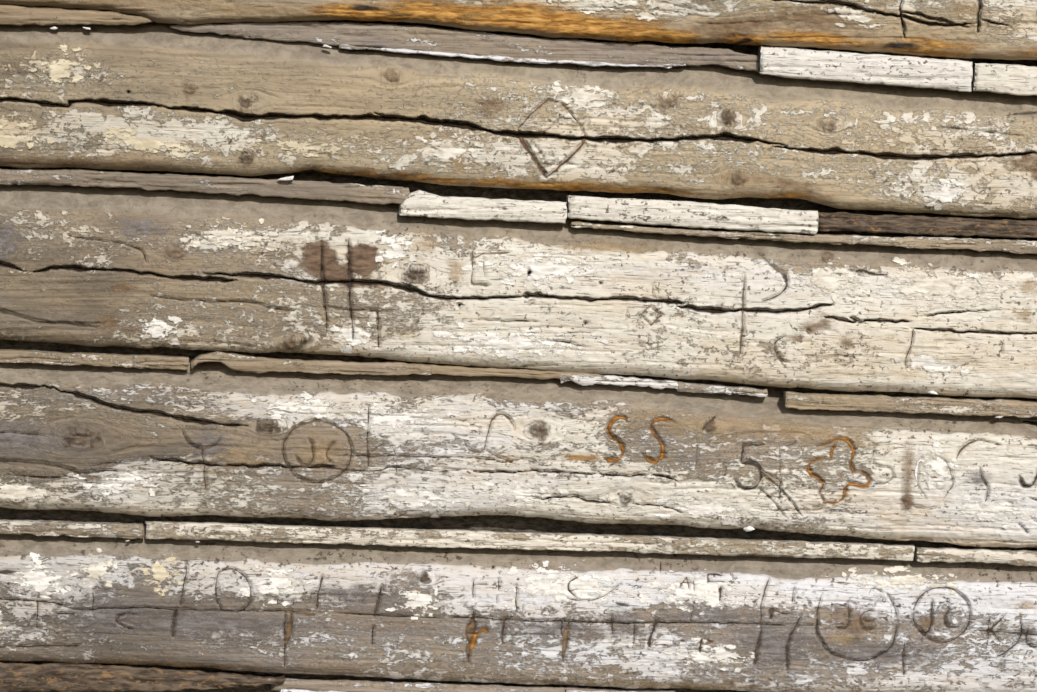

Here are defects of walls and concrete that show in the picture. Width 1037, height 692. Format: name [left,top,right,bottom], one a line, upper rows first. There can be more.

crack [772,0,1008,37]
crack [0,98,1037,159]
crack [0,234,1037,347]
crack [0,384,240,426]
peeling [3,548,118,600]
peeling [137,554,184,596]
peeling [237,565,312,607]
peeling [385,588,452,620]
peeling [494,560,758,616]
peeling [816,565,979,595]
peeling [661,636,760,672]